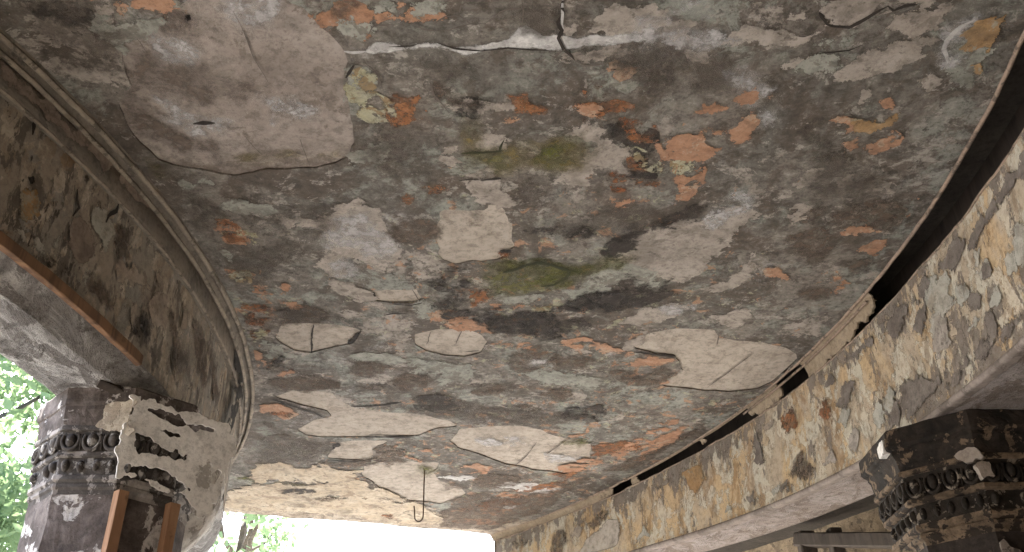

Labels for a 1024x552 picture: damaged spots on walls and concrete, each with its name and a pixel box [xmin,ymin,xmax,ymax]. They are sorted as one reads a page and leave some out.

crack [344,0,524,89]
water stain [362,5,775,174]
crack [550,0,607,67]
spalling [436,97,517,264]
peeling [218,197,487,386]
water stain [428,266,695,373]
peeling [524,368,606,395]
peeling [489,206,789,305]
spalling [619,303,797,391]
peeling [820,150,1024,459]
spalling [269,391,591,503]
flaking render [999,539,1022,552]